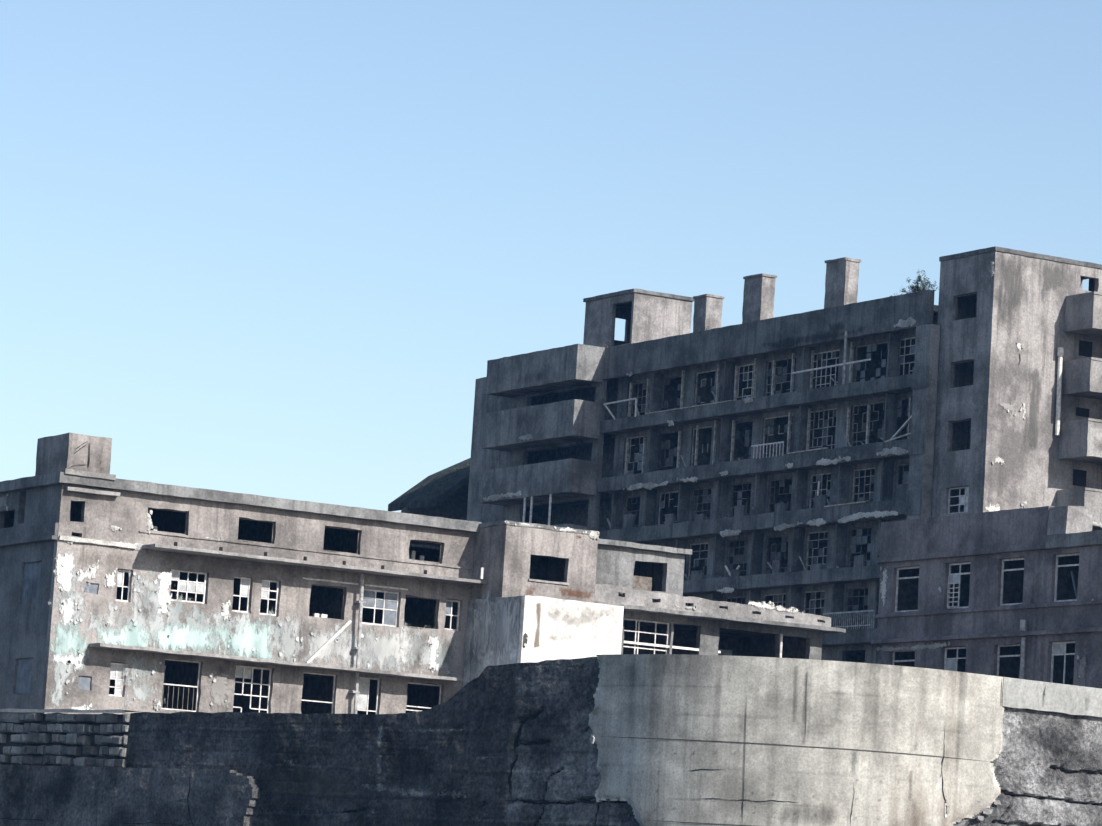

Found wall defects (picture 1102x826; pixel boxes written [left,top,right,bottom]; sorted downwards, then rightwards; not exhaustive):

spalling [110,510,153,552]
peeling [49,540,454,711]
peeling [466,590,529,660]
crack [483,710,628,826]
crack [998,767,1102,826]